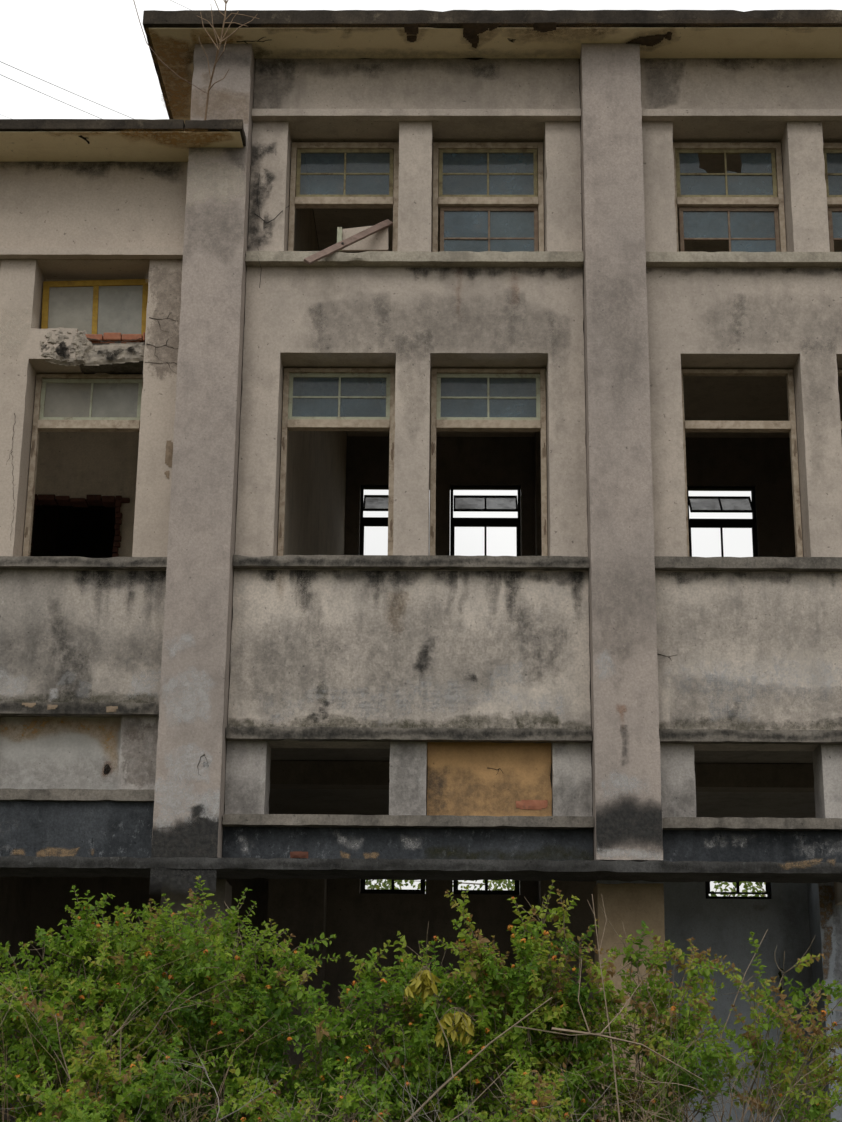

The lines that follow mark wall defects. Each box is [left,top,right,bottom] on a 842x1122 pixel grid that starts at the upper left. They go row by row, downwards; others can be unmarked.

spalling [404,24,419,42]
spalling [463,23,501,48]
spalling [533,22,557,32]
spalling [626,32,672,46]
mould [248,146,274,249]
spalling [40,327,145,366]
crack [145,312,178,369]
damp [415,648,427,691]
damp [234,701,588,739]
damp [596,774,841,874]